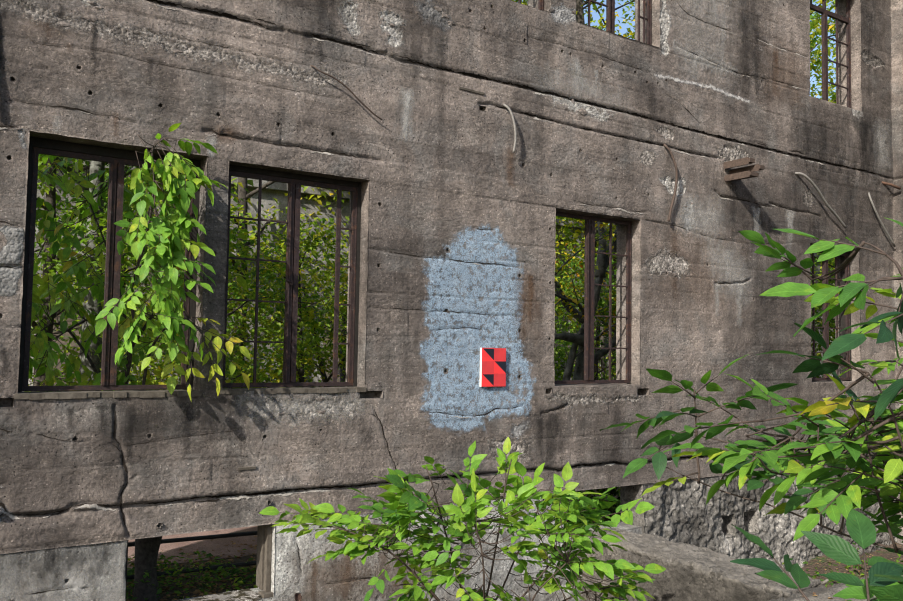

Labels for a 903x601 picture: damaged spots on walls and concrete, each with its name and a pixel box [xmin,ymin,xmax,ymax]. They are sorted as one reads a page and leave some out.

crack [0,405,623,530]